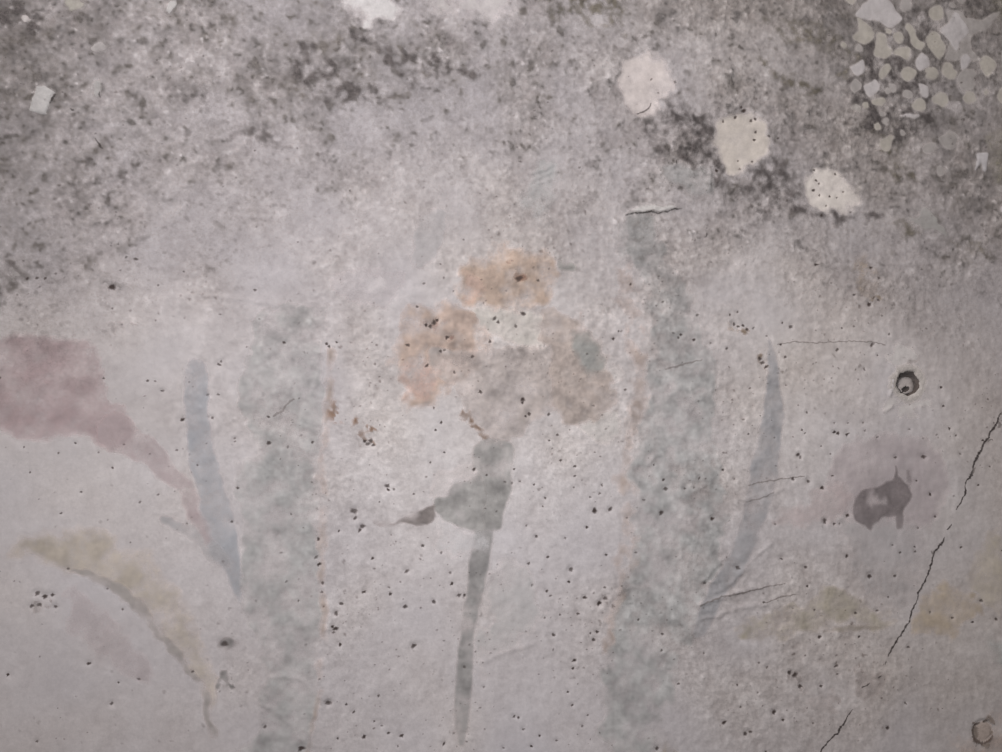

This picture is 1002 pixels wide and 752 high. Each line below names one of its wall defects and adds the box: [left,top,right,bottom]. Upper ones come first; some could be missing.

peeling [344,0,399,28]
spalling [618,52,676,116]
peeling [841,0,1002,154]
water stain [0,0,1002,349]
spalling [714,106,779,175]
spalling [805,168,859,217]
peeling [975,152,989,172]
crack [820,412,1002,752]